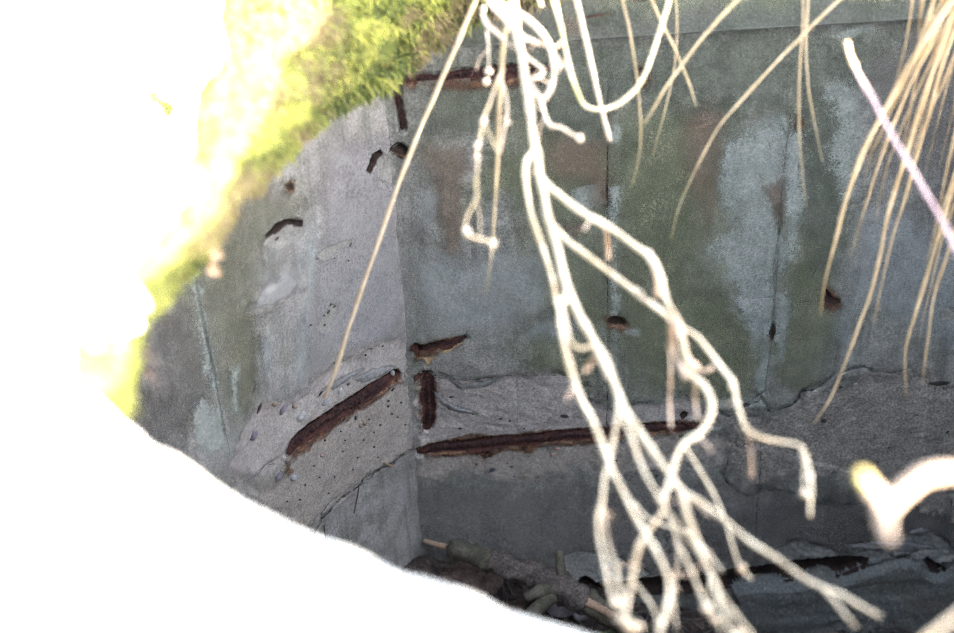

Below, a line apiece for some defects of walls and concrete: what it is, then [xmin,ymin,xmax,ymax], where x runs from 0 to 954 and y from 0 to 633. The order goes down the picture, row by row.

rust [395,64,550,130]
leakage [418,252,543,332]
leakage [648,83,866,414]
crack [704,118,910,419]
rust [285,335,467,476]
rust [417,420,712,459]
spalling [228,337,954,531]
crack [723,440,865,540]
spalling [770,527,954,564]